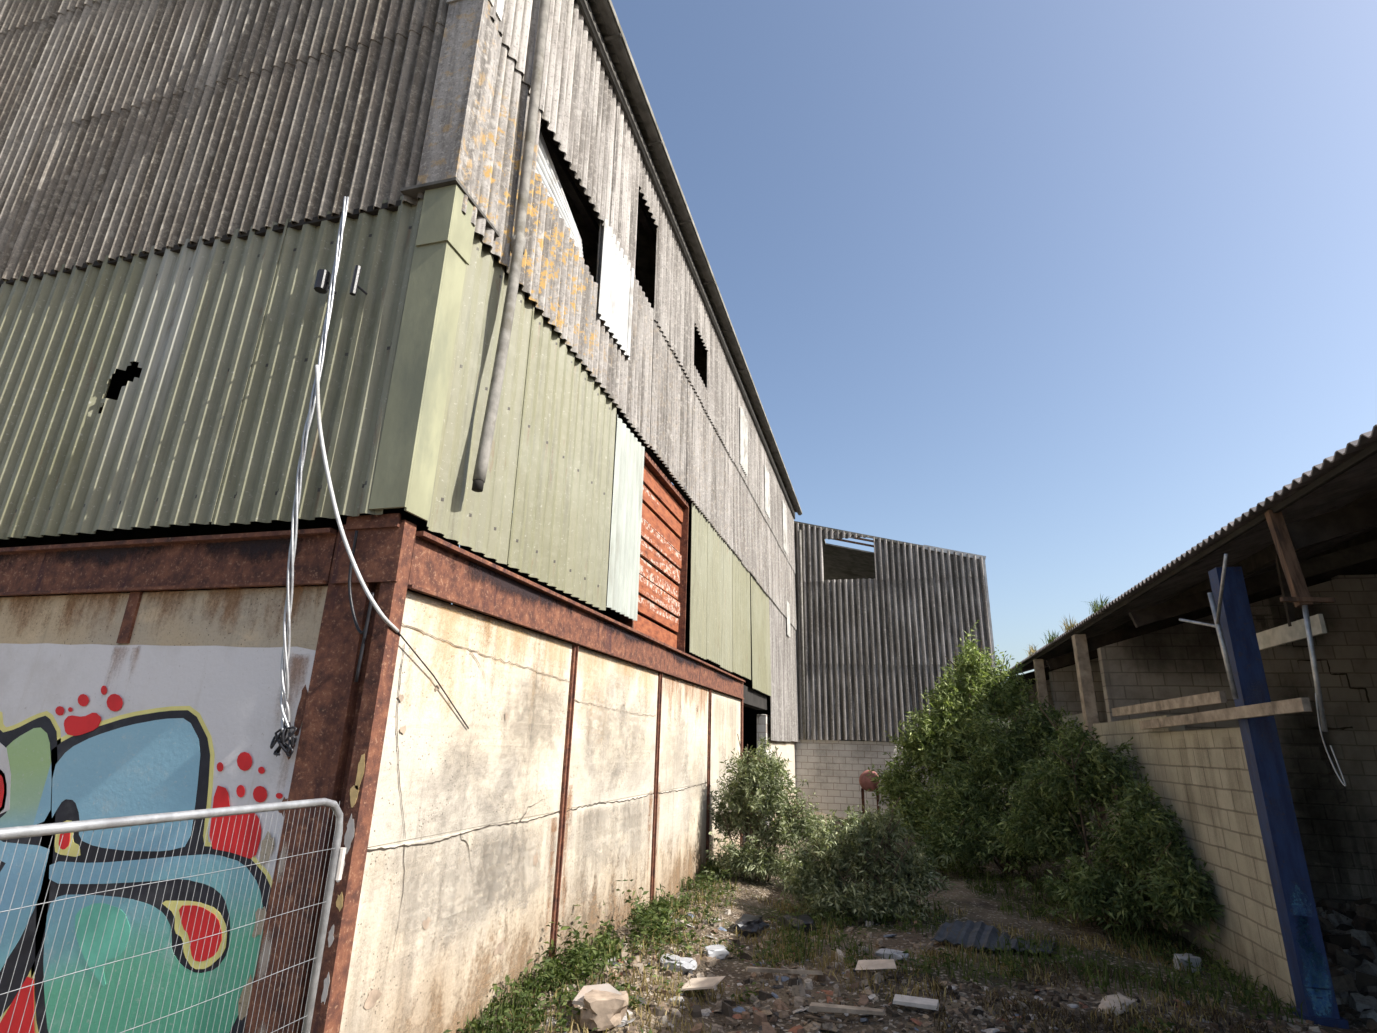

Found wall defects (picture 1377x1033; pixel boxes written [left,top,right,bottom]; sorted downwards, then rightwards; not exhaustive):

rust [283,585,303,615]
rust [287,657,308,760]
peeling [328,754,365,948]
water stain [405,836,539,940]
rust [548,789,572,908]
peeling [321,972,330,1004]